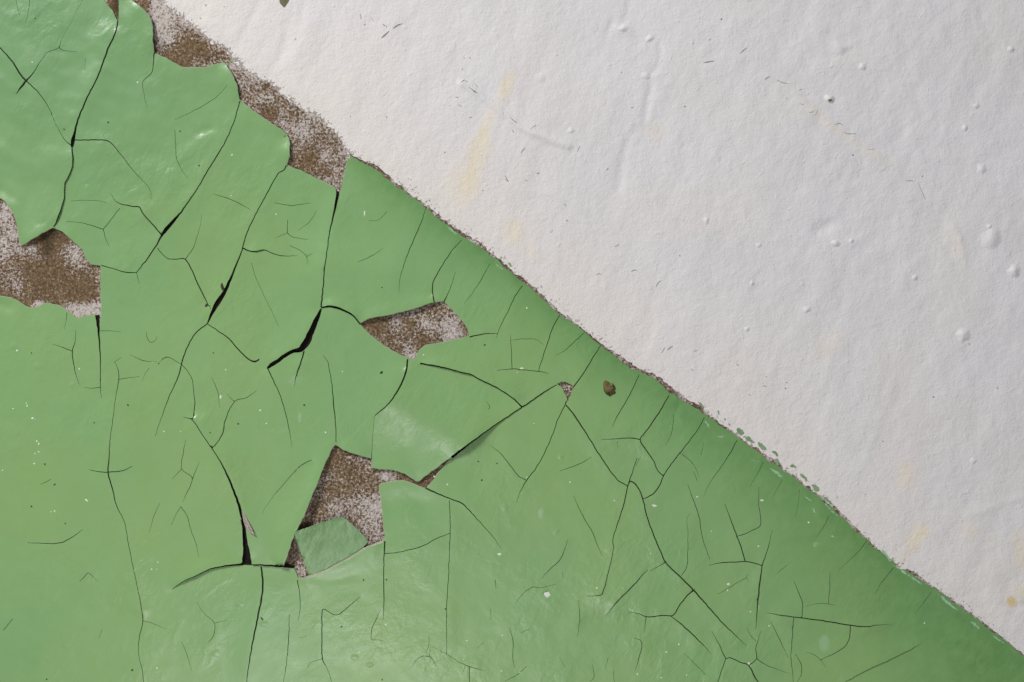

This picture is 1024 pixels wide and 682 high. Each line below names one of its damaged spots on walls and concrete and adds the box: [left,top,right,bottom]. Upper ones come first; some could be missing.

crack [0,20,361,682]
crack [399,207,427,284]
peeling [0,0,894,578]
crack [432,240,490,303]
crack [371,286,888,682]
peeling [906,569,1024,656]